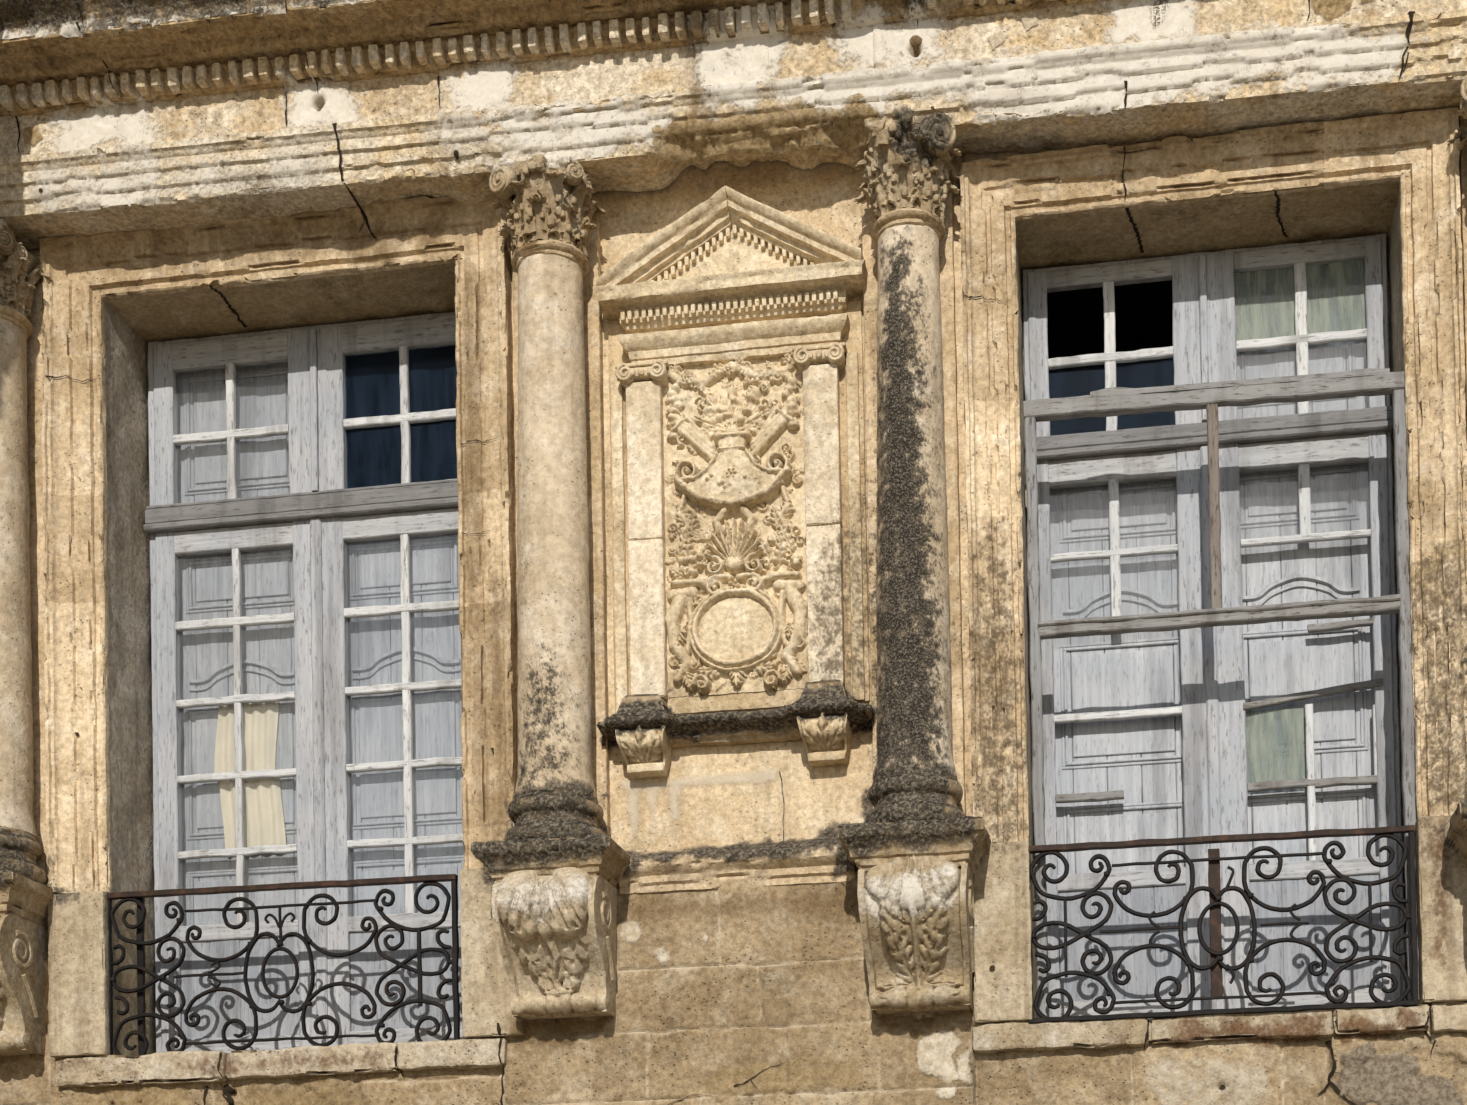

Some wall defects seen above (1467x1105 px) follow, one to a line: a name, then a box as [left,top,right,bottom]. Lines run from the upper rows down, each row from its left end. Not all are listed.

leakage [0,0,383,39]
crack [1399,11,1415,79]
crack [1122,81,1130,108]
crack [285,52,379,241]
crack [1122,146,1144,253]
crack [1274,191,1289,237]
leakage [596,625,982,923]
leakage [1435,795,1467,858]
crack [203,1052,235,1105]
peeling [916,1029,972,1099]
crack [1318,1039,1356,1105]
spalling [1335,1042,1464,1105]